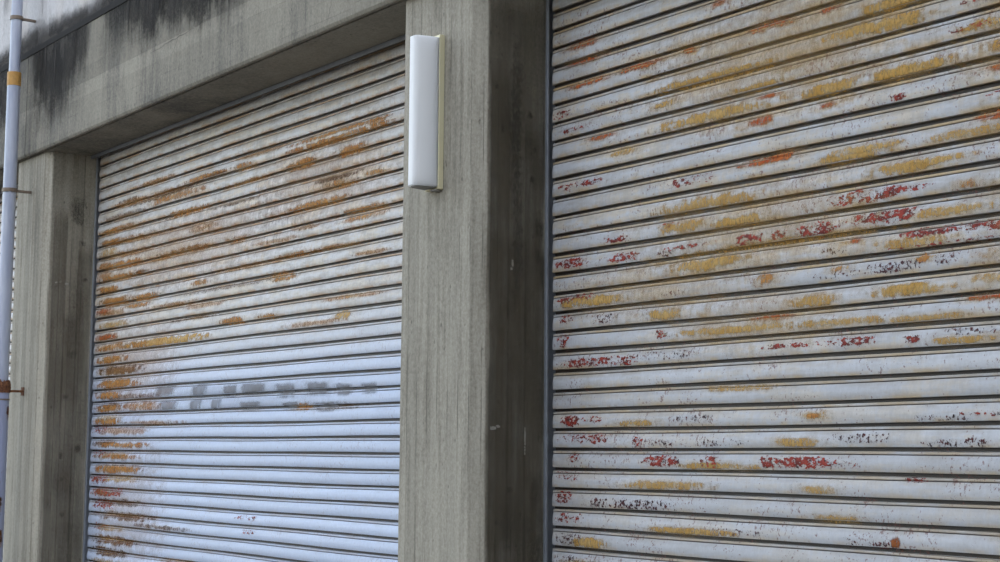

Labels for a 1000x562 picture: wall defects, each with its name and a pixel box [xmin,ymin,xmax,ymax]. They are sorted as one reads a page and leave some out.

water stain [0,0,210,117]
corrosion [654,59,786,131]
corrosion [122,115,394,207]
corrosion [290,169,385,221]
peeling [736,183,933,255]
peeling [813,220,1000,279]
corrosion [94,258,209,425]
corrosion [172,313,244,325]
peeling [760,336,875,349]
peeling [760,455,856,469]
peeling [921,438,987,449]
corrosion [94,440,170,562]